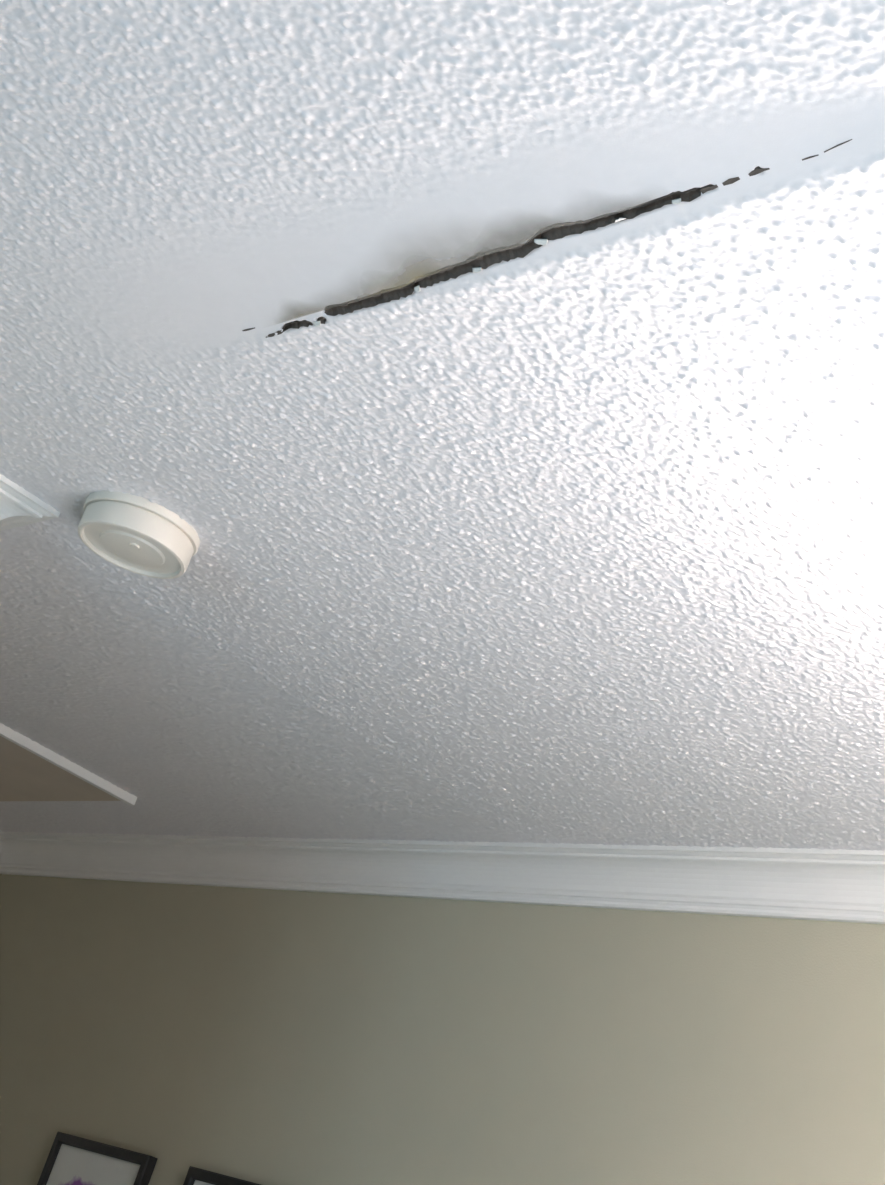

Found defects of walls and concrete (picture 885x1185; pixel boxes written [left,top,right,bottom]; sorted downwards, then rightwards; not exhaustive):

crack [802,139,852,161]
crack [242,166,770,338]